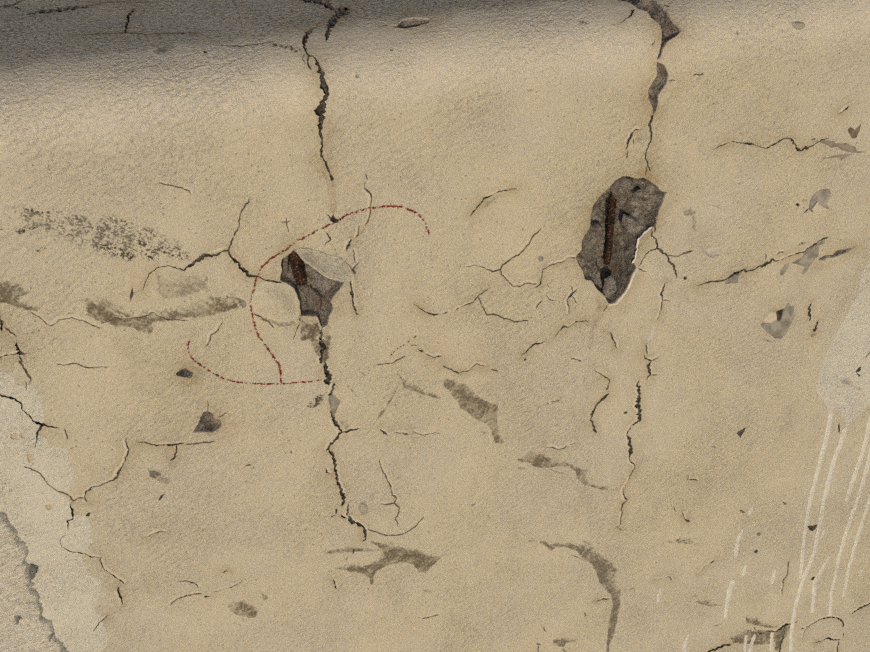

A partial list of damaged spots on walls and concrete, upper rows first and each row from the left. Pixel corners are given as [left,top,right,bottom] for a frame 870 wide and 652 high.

crack [295,0,353,181]
spalling [620,0,681,114]
crack [0,317,68,448]
crack [143,198,282,289]
spalling [280,214,355,339]
crack [617,344,659,532]
spalling [576,176,722,311]
crack [696,237,828,286]
peeling [760,303,795,339]
peeling [796,189,831,214]
peeling [780,239,859,275]
crack [23,438,211,630]